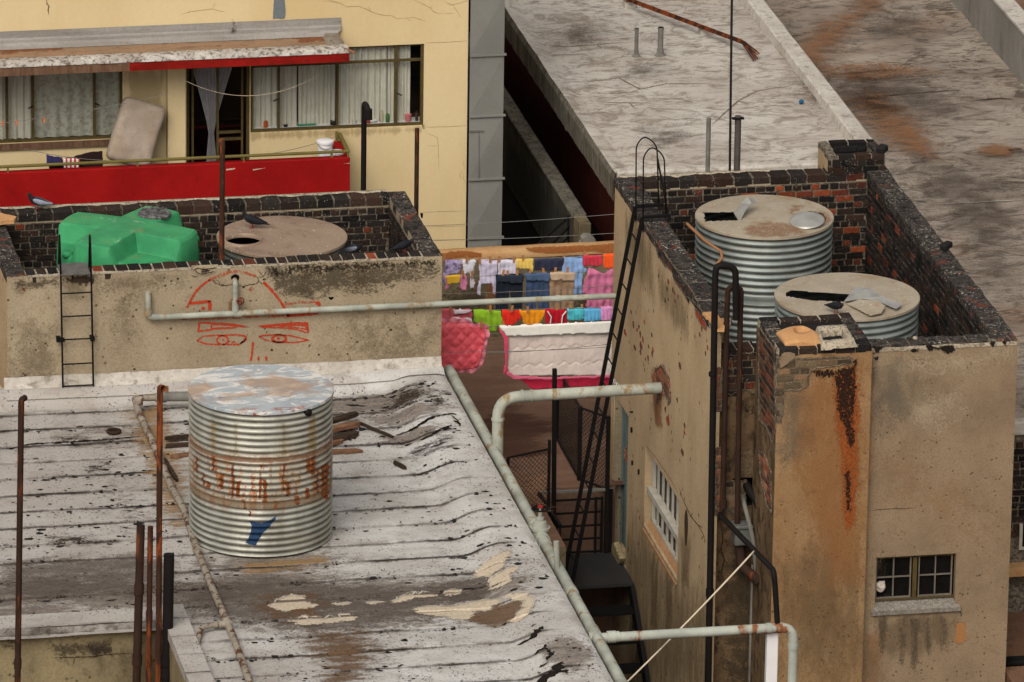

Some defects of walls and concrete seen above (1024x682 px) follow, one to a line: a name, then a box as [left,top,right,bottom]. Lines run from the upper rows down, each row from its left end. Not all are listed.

crack [328,0,468,43]
flaking render [624,309,681,426]
flaking render [714,327,853,516]
rust [813,359,862,535]
peeling [268,593,357,625]
peeling [366,550,538,623]